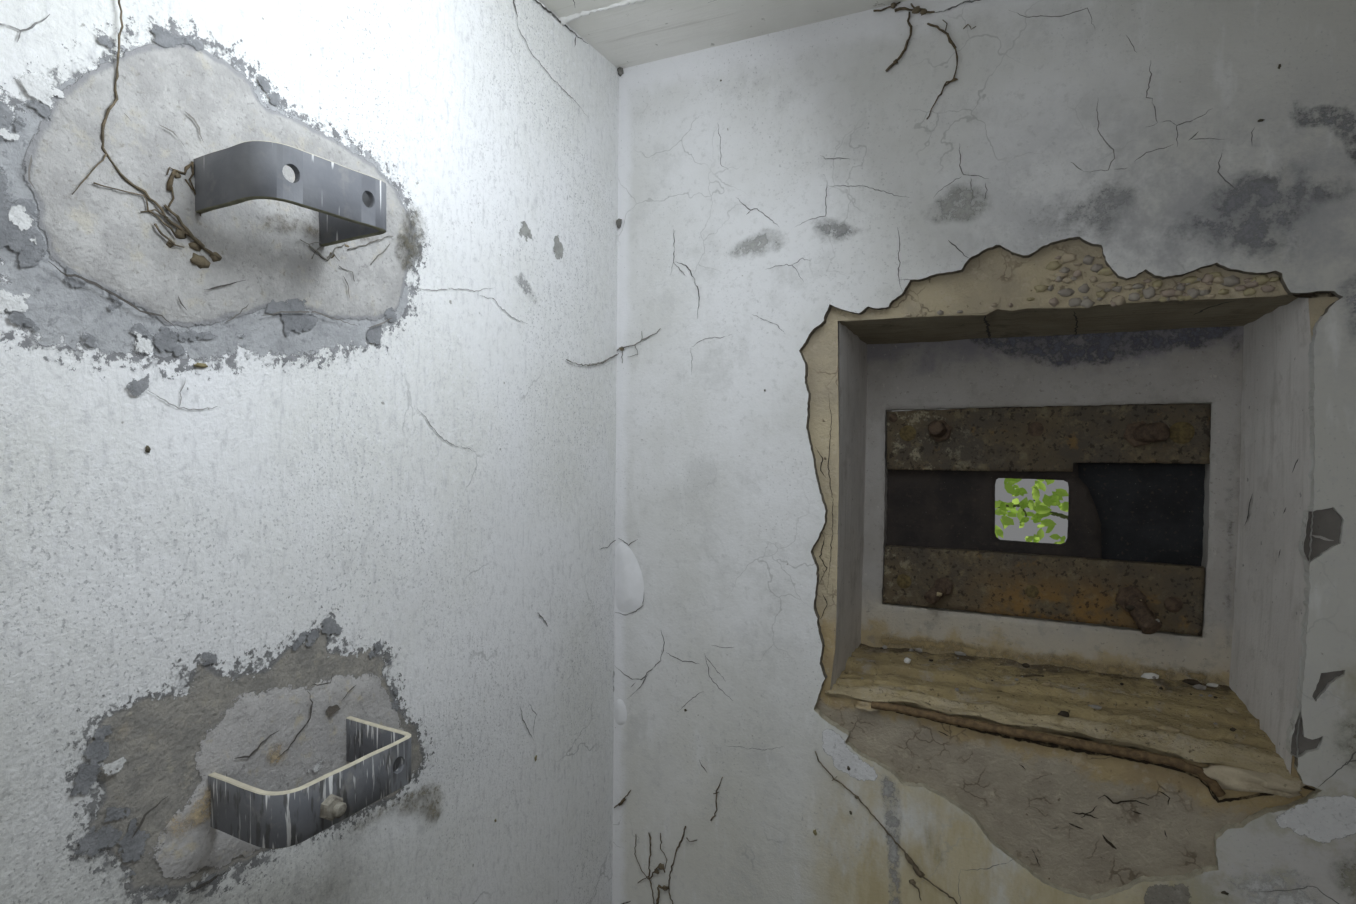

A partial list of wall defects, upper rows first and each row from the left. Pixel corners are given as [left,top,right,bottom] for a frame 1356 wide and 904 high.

crack [935,0,980,13]
crack [1018,8,1092,23]
crack [1071,35,1254,190]
peeling [0,16,431,396]
crack [739,147,988,292]
flaking render [802,239,1343,904]
peeling [44,604,434,904]
leakage [882,778,900,904]